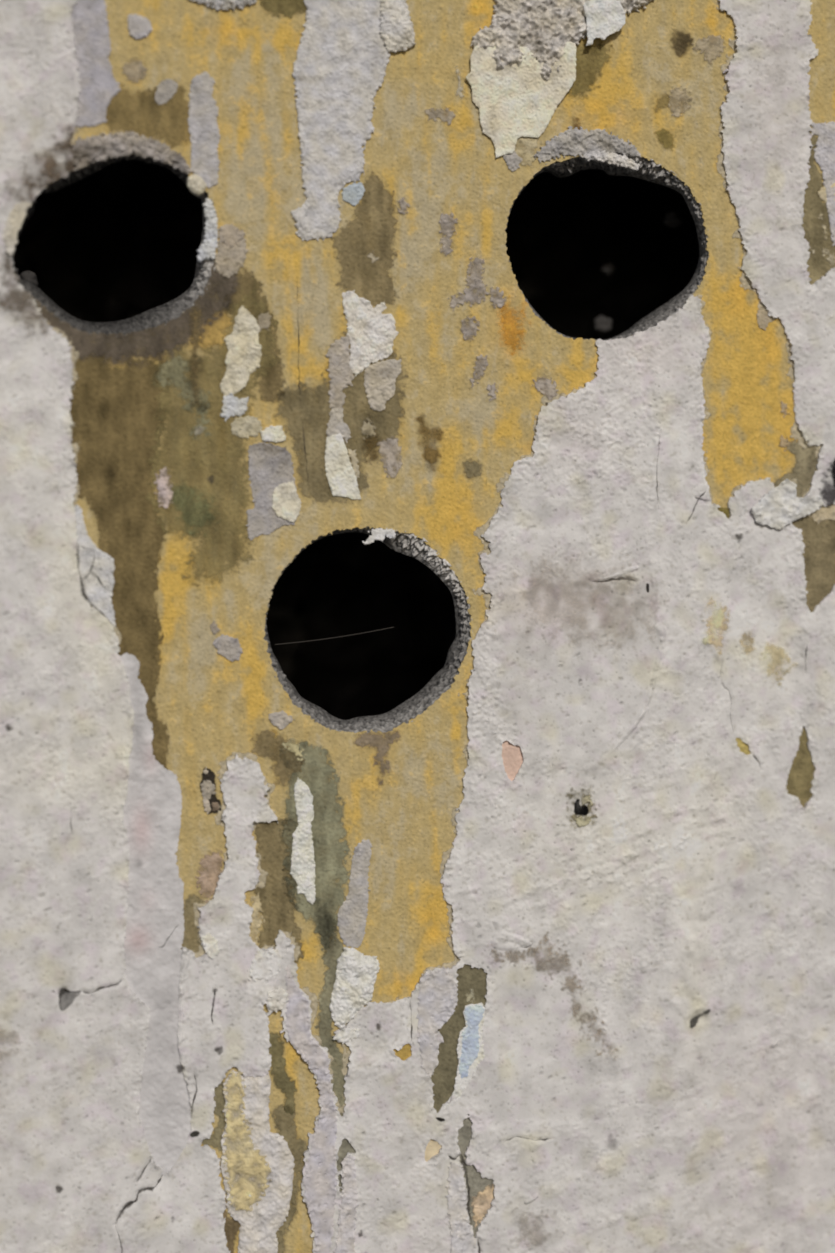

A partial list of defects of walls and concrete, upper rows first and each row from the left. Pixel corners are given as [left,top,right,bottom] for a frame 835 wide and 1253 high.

peeling [801,0,835,285]
peeling [326,408,351,443]
crack [77,546,114,626]
peeling [172,489,214,526]
peeling [752,479,835,612]
spalling [200,767,222,814]
peeling [786,727,816,808]
peeling [59,988,81,1011]
peeling [416,964,488,1113]
peeling [201,965,358,1253]
crack [115,1159,162,1253]
peeling [446,1114,494,1253]